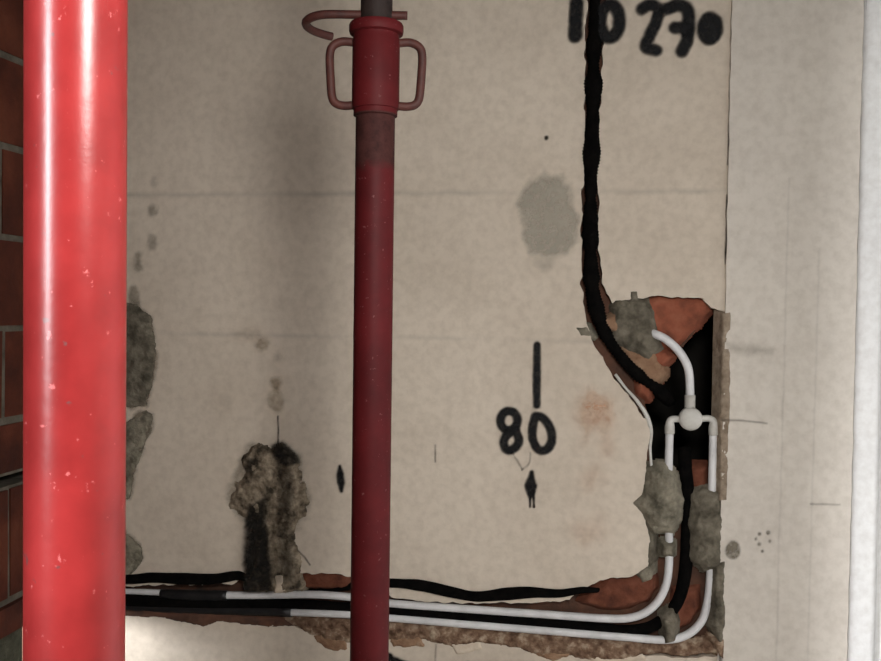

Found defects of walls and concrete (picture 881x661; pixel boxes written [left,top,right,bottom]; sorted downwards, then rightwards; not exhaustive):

flaking render [634,380,665,404]
spalling [649,296,731,501]
peeling [274,575,285,593]
flaking render [303,573,351,589]
flaking render [575,561,659,610]
spalling [125,610,350,651]
spalling [389,584,724,661]